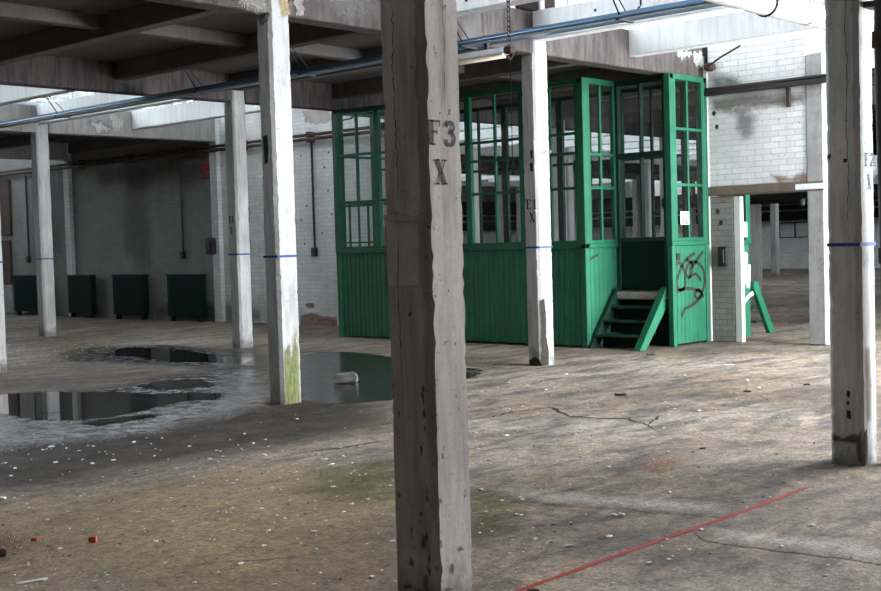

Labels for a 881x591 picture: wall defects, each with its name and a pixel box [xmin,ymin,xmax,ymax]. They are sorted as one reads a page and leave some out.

peeling [238,0,270,25]
damp [0,337,394,507]
crack [472,407,662,430]